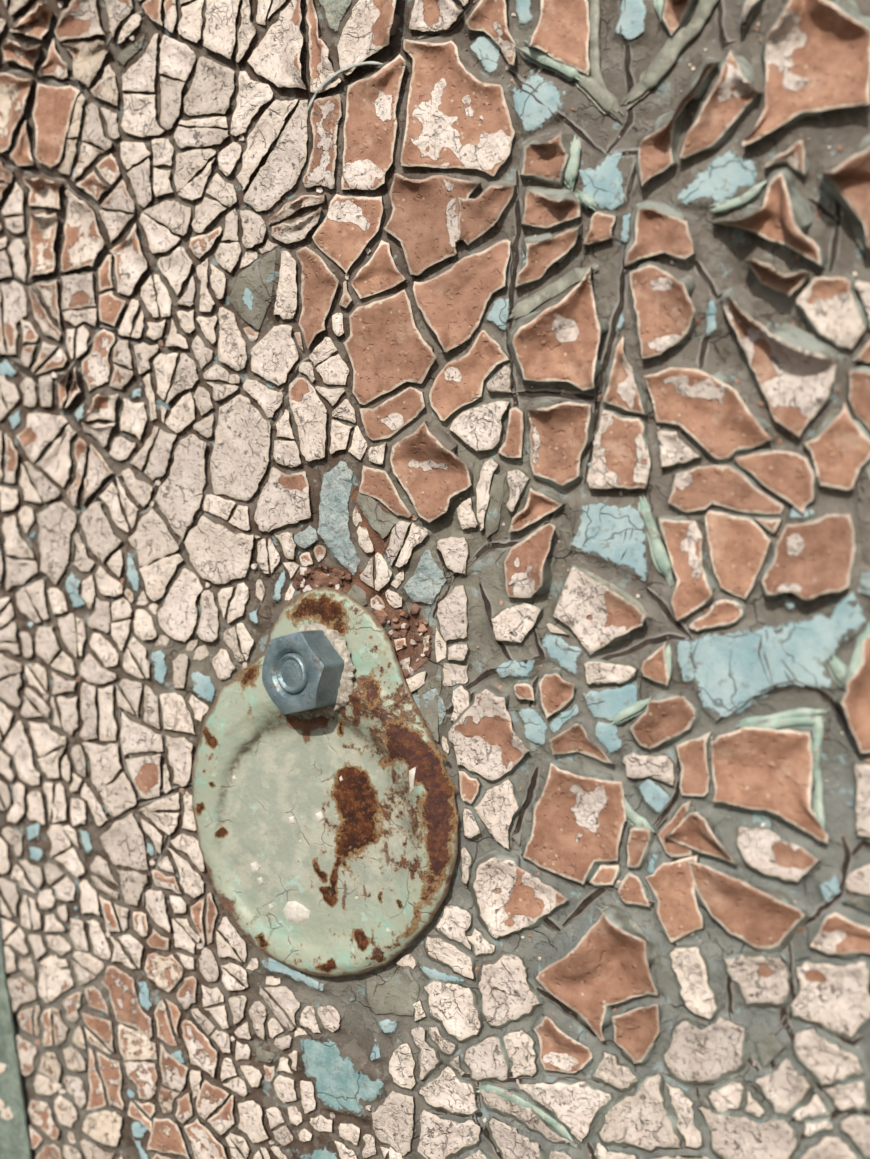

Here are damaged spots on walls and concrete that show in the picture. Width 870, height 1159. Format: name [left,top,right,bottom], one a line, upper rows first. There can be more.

peeling [409,0,718,131]
peeling [635,0,870,268]
crack [0,325,178,387]
crack [504,170,630,484]
peeling [515,134,701,358]
rust [285,714,346,743]
rust [356,671,382,711]
rust [312,716,459,938]
crack [418,495,556,718]
peeling [347,238,870,1159]
rust [352,928,370,951]
crack [653,836,870,1159]